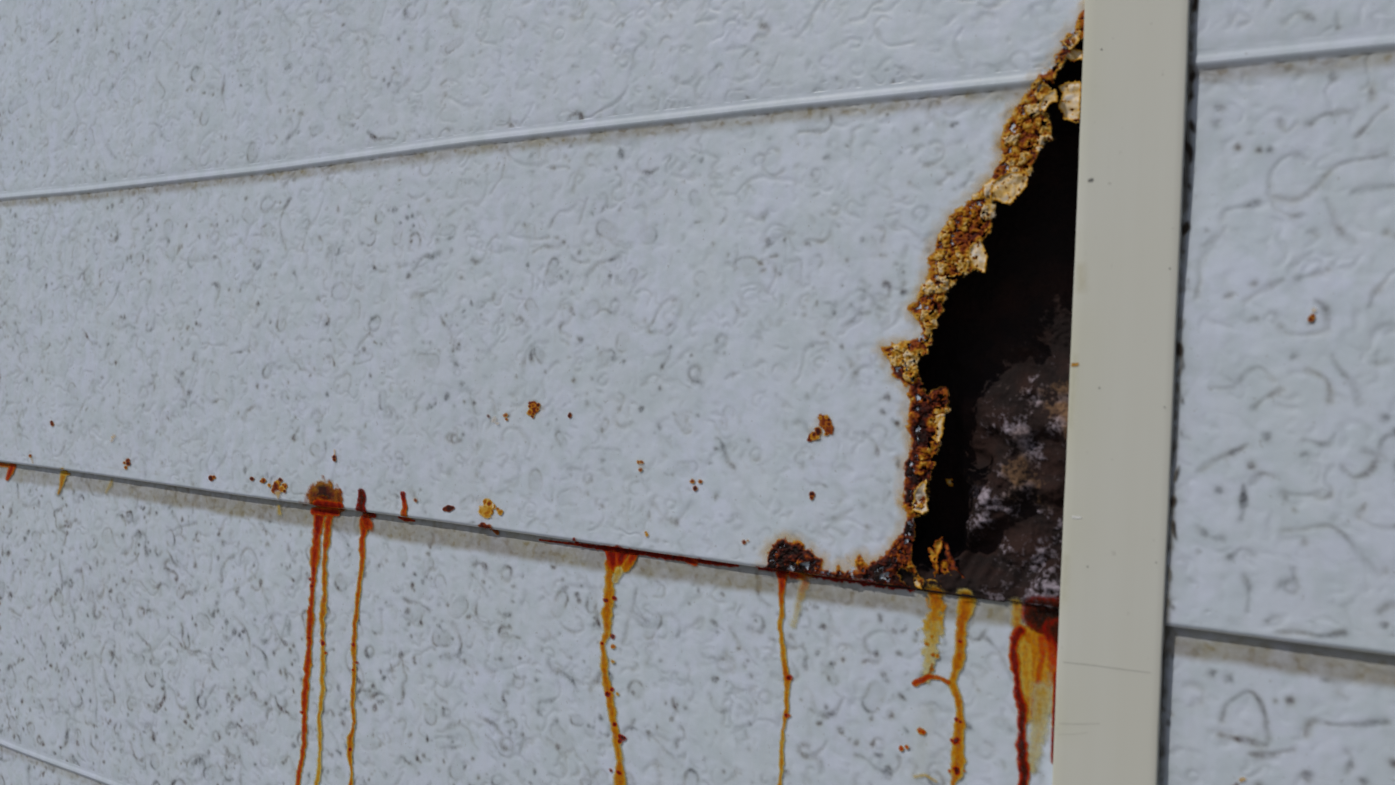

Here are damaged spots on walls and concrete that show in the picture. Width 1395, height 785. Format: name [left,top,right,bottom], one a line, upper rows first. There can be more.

peeling [1060,30,1083,62]
peeling [1039,81,1082,124]
peeling [990,171,1029,205]
peeling [968,239,988,273]
rust [756,8,1085,785]
peeling [934,415,945,445]
rust [0,454,31,481]
rust [57,468,70,495]
peeling [912,479,929,515]
peeling [913,537,964,590]
rust [295,476,376,785]
rust [539,531,739,785]